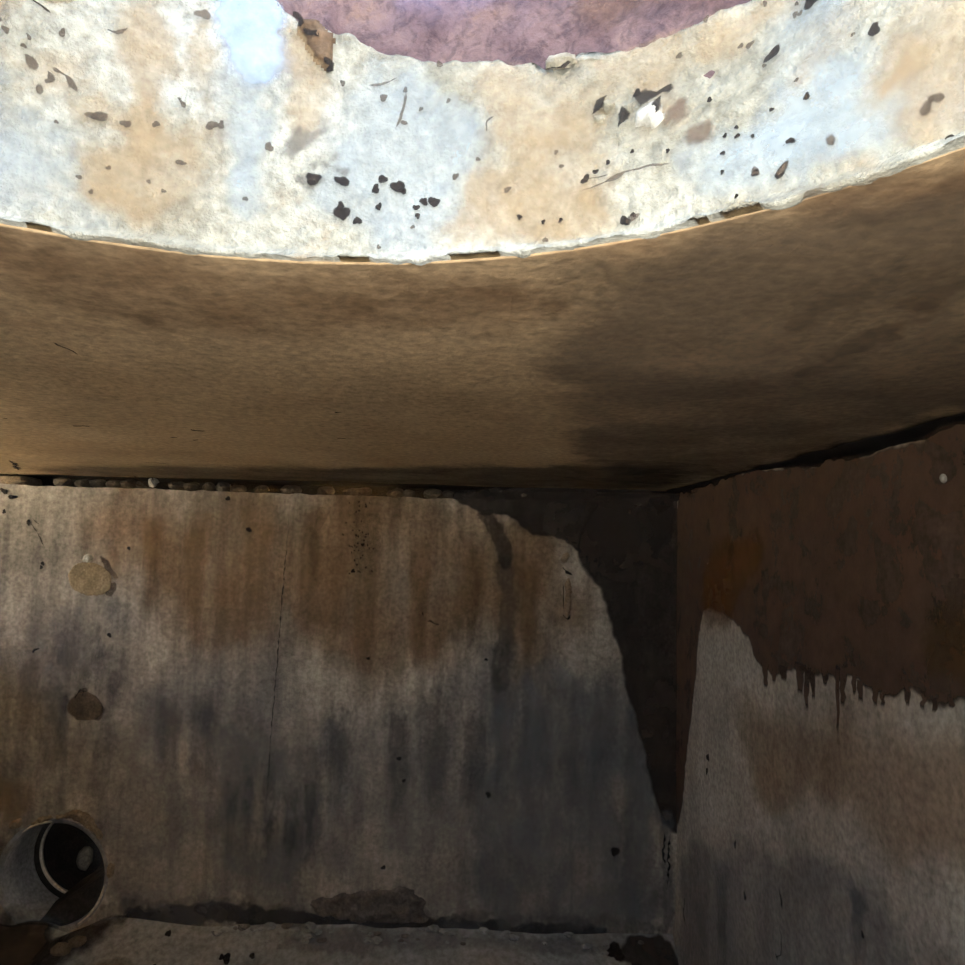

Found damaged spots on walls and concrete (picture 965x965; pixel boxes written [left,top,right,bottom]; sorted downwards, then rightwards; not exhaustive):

spalling [194,9,211,19]
hole [793,0,818,18]
efflorescence [216,0,288,83]
spalling [293,11,336,72]
peeling [546,52,578,70]
spalling [762,45,780,67]
leakage [0,196,965,833]
leakage [124,901,607,950]